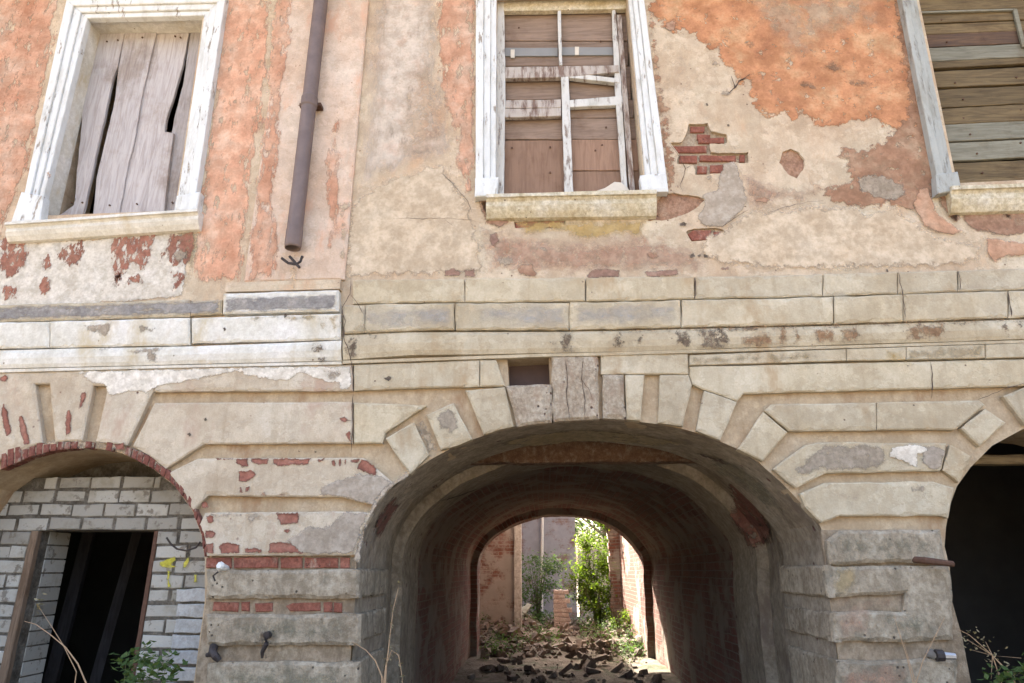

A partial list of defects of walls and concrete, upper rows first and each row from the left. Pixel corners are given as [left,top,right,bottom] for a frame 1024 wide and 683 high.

peeling [0,0,58,300]
peeling [111,0,292,291]
peeling [648,0,1024,272]
flaking render [39,240,85,295]
water stain [677,327,758,362]
crack [565,361,592,418]
peeling [1,348,351,569]
flaking render [216,451,376,493]
spalling [729,484,770,548]
flaking render [212,602,273,612]
flaking render [286,602,342,613]